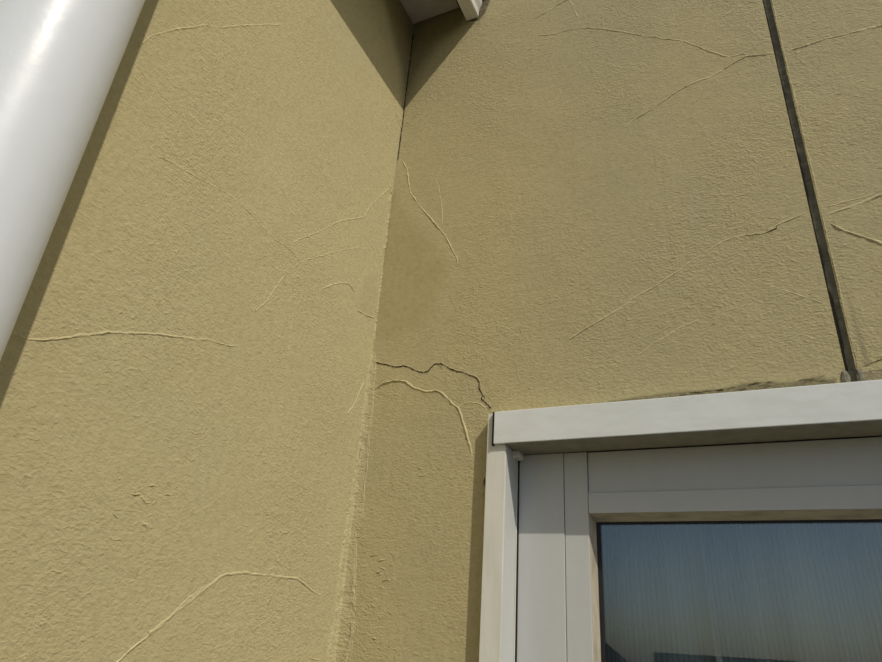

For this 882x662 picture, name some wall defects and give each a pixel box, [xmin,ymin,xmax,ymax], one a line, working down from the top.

crack [568,190,882,341]
crack [302,361,492,456]